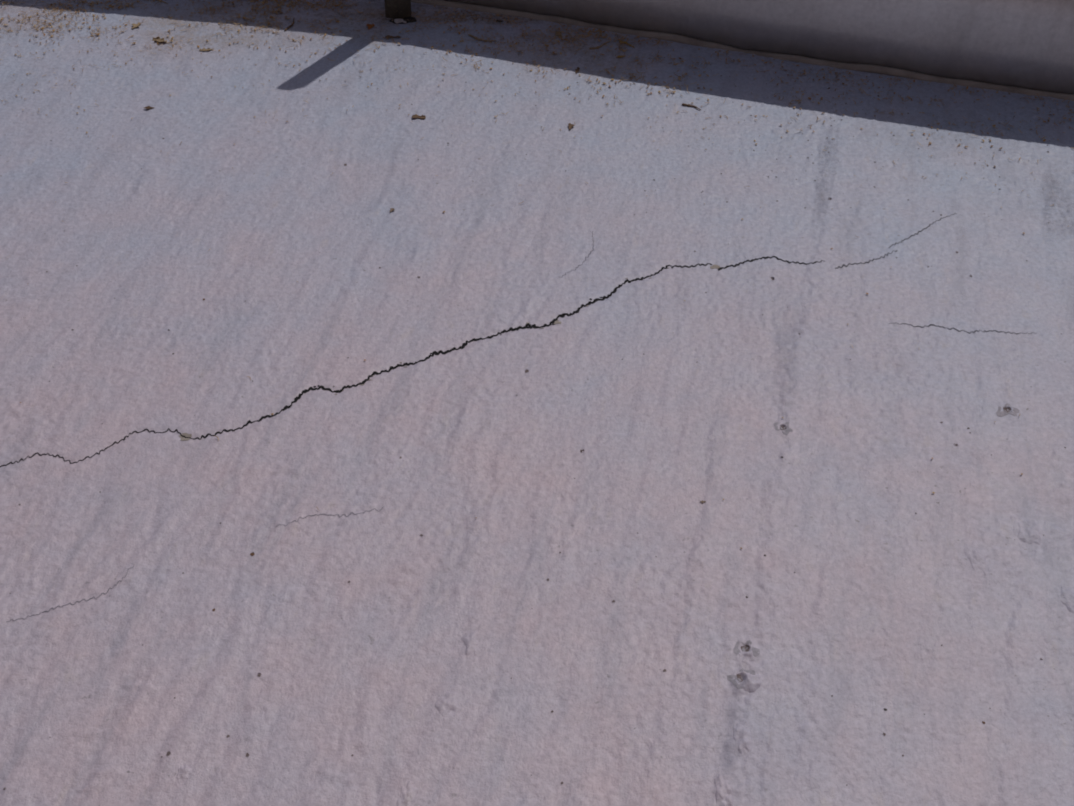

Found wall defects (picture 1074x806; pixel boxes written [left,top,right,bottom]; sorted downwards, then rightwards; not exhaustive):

crack [0,214,954,467]